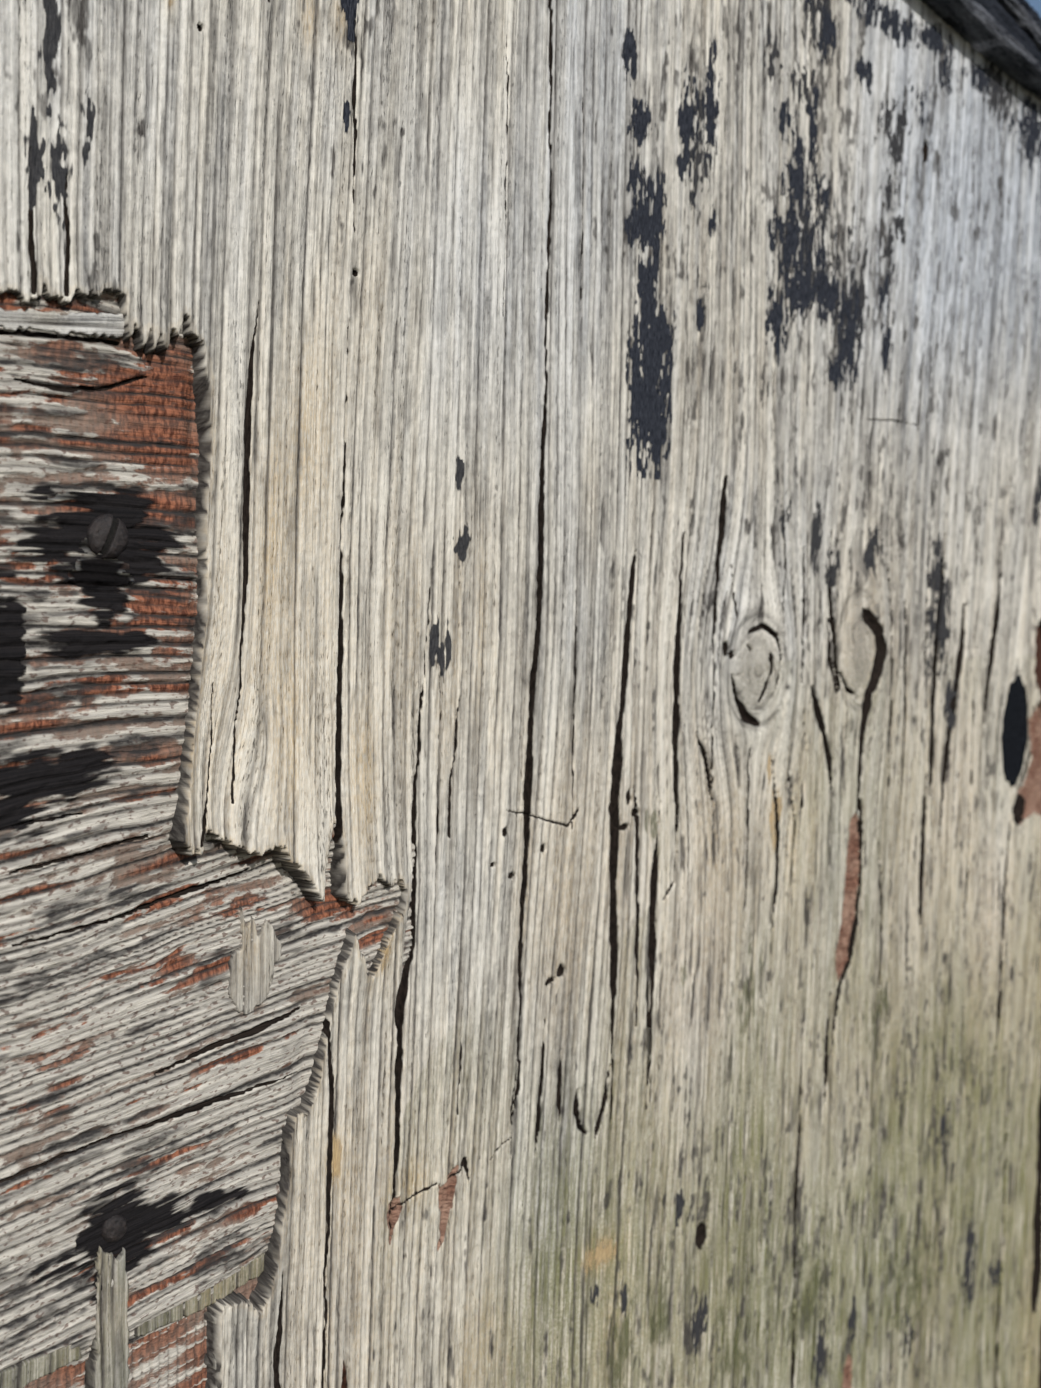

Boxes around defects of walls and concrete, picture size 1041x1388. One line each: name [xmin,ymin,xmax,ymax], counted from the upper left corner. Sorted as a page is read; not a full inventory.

crack [350,19,358,232]
peeling [622,28,721,480]
peeling [804,0,837,67]
peeling [765,83,894,392]
peeling [845,0,998,163]
peeling [1009,92,1041,168]
peeling [0,291,415,1388]
crack [389,0,1002,1388]
crack [995,751,1031,1050]
crack [995,1088,1041,1388]